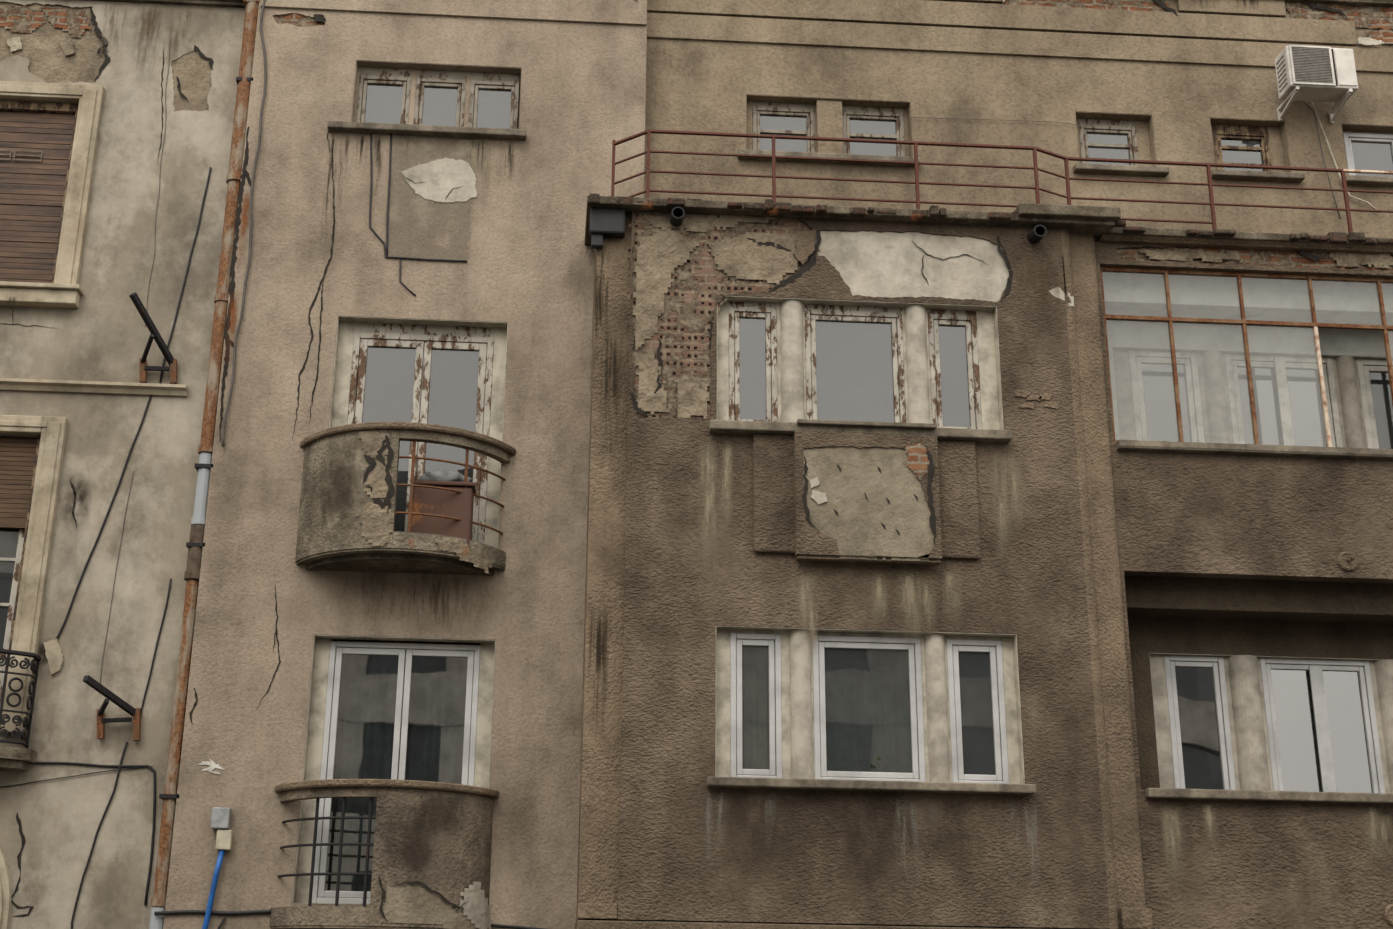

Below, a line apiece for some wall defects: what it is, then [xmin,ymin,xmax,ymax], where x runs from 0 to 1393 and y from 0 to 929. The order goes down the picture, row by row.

peeling [0,3,111,83]
crack [157,47,165,157]
peeling [171,45,214,111]
flaking render [1002,0,1178,16]
flaking render [1285,2,1393,46]
crack [292,131,335,440]
peeling [589,193,1033,421]
spalling [1113,220,1393,276]
peeling [356,429,395,546]
peeling [802,443,937,561]
crack [256,585,281,710]